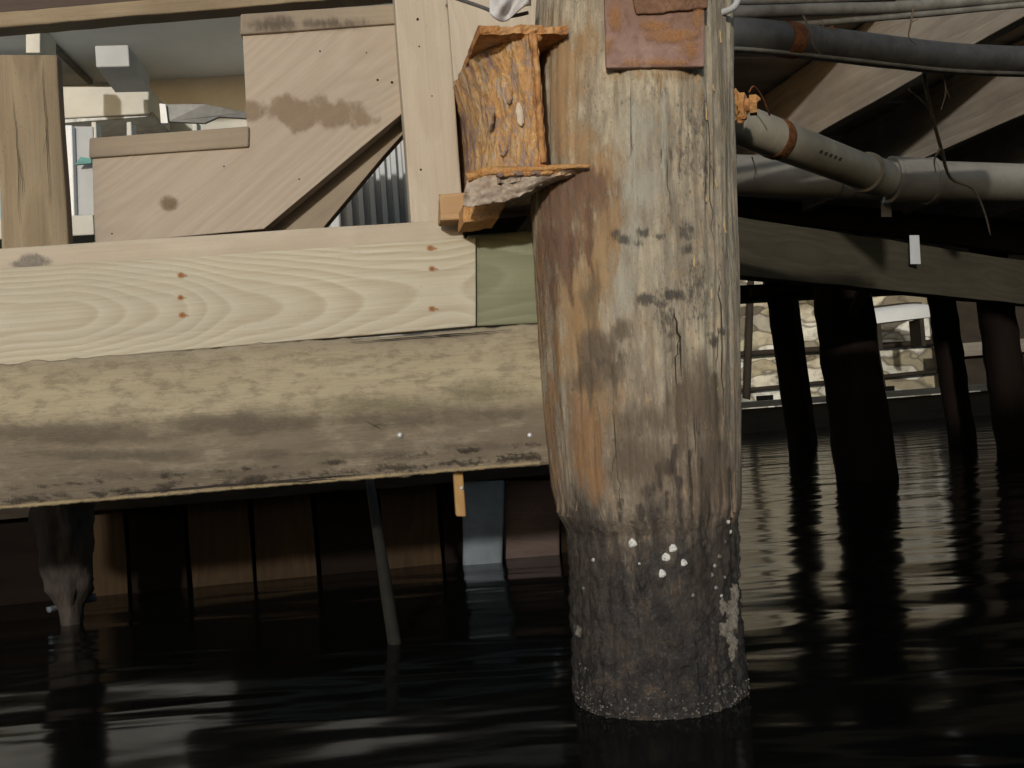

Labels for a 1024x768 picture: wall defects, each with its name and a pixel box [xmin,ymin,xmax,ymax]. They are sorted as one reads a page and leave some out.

leakage [272,96,367,129]
leakage [612,92,706,253]
leakage [579,265,705,405]
leakage [213,447,483,486]
leakage [496,443,541,464]
leakage [5,472,200,505]